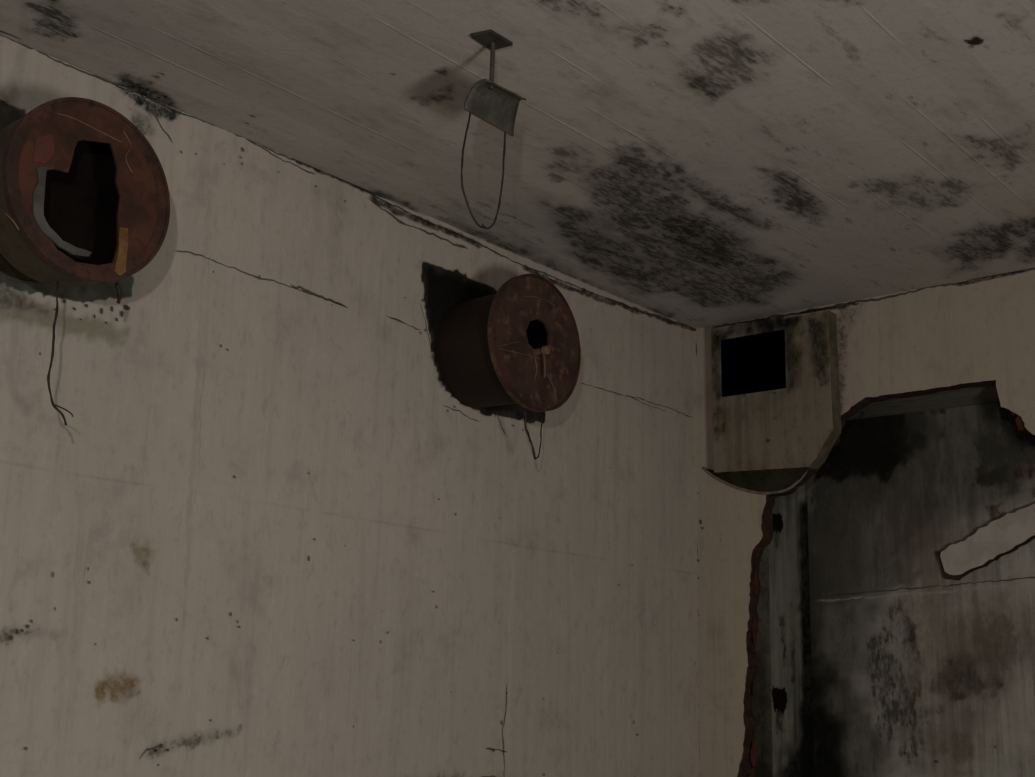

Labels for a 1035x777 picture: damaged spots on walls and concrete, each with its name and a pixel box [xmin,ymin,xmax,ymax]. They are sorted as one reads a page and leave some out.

damp [689,39,761,98]
crack [0,30,1035,354]
damp [546,148,794,307]
damp [759,169,820,217]
damp [946,218,1035,266]
damp [746,315,844,408]
spalling [1001,407,1035,436]
spalling [737,380,998,777]
damp [753,402,1035,777]
crack [482,688,508,777]